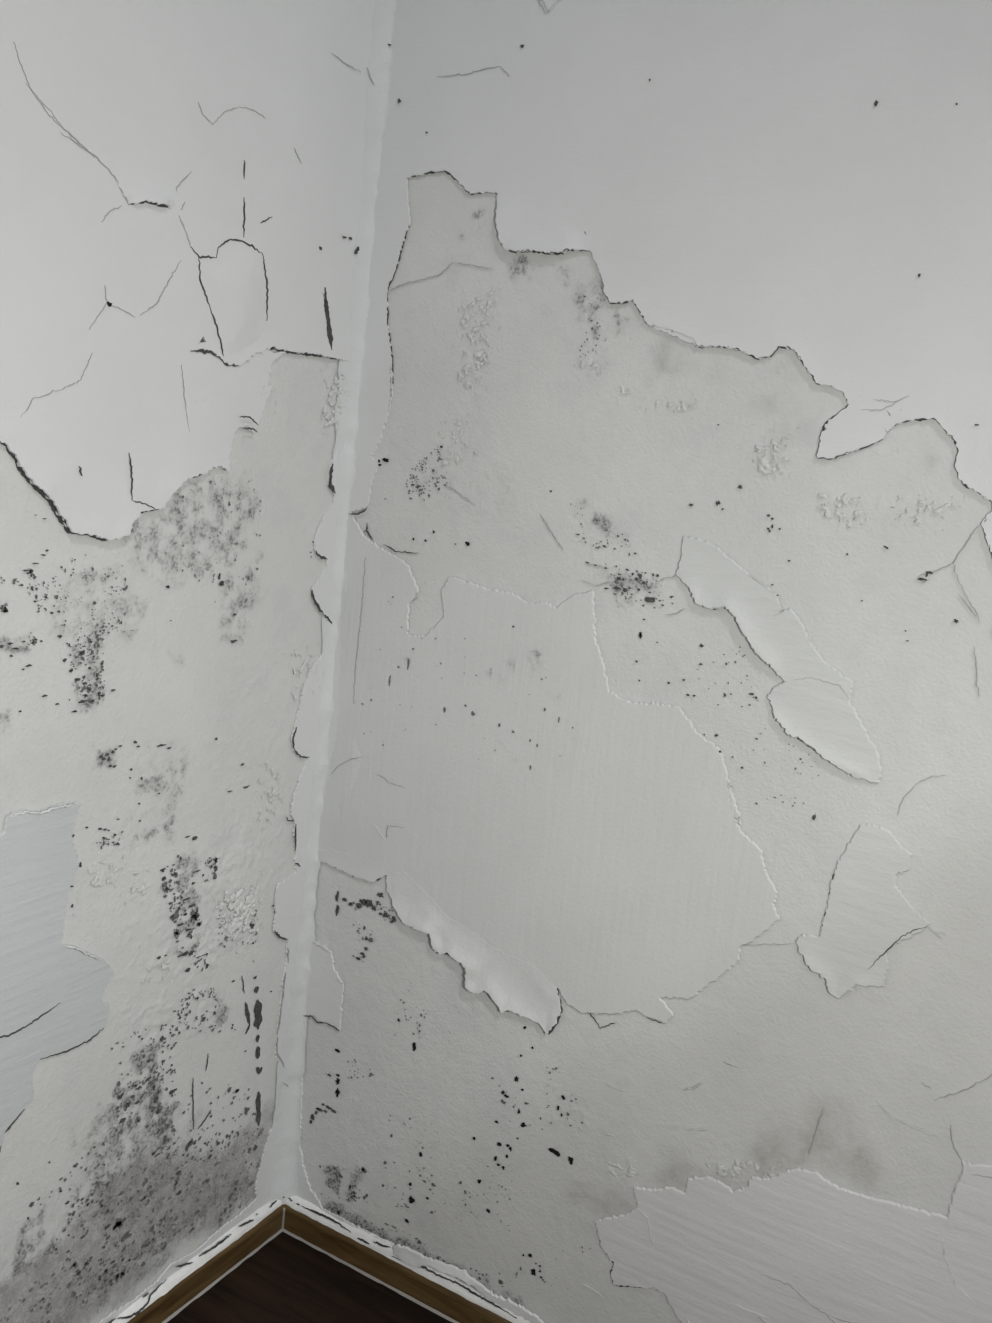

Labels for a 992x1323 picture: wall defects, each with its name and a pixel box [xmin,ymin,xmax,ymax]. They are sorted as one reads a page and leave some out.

crack [198,102,265,125]
crack [14,43,192,416]
crack [323,287,333,350]
damp [0,549,132,712]
damp [570,503,674,643]
peeling [300,171,992,1323]
peeling [0,328,351,1323]
damp [156,855,218,972]
damp [335,891,396,962]
damp [0,961,272,1323]
damp [319,1115,450,1264]
damp [459,1076,583,1231]